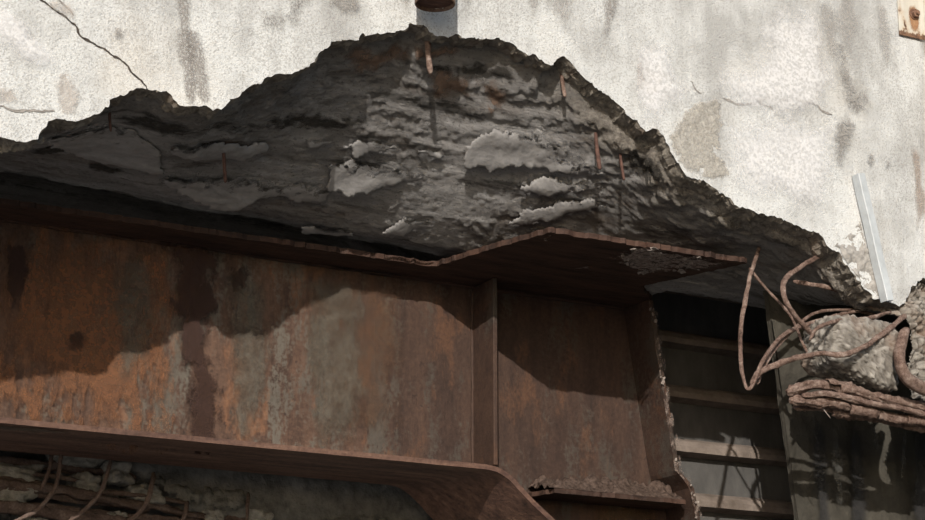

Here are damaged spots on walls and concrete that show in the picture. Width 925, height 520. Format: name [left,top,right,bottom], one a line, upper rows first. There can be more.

crack [40,0,149,91]
water stain [178,0,208,102]
spalling [46,32,925,433]
rust [160,241,224,438]
spalling [0,454,274,520]